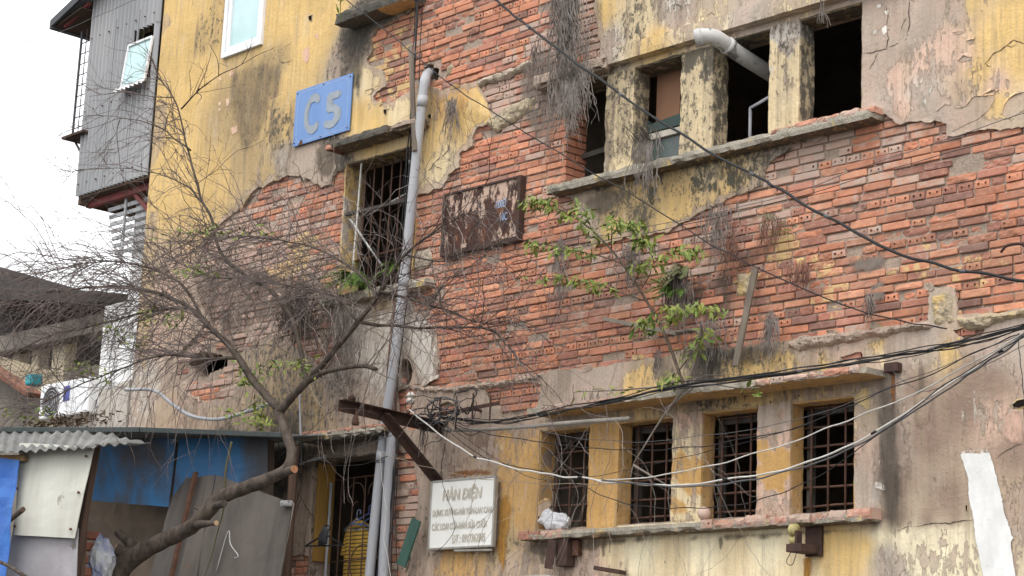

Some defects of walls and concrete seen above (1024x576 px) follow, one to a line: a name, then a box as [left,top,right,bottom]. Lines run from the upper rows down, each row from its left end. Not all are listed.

crack [869,1,910,69]
spalling [369,0,1024,420]
mould [690,158,755,198]
water stain [875,388,899,523]